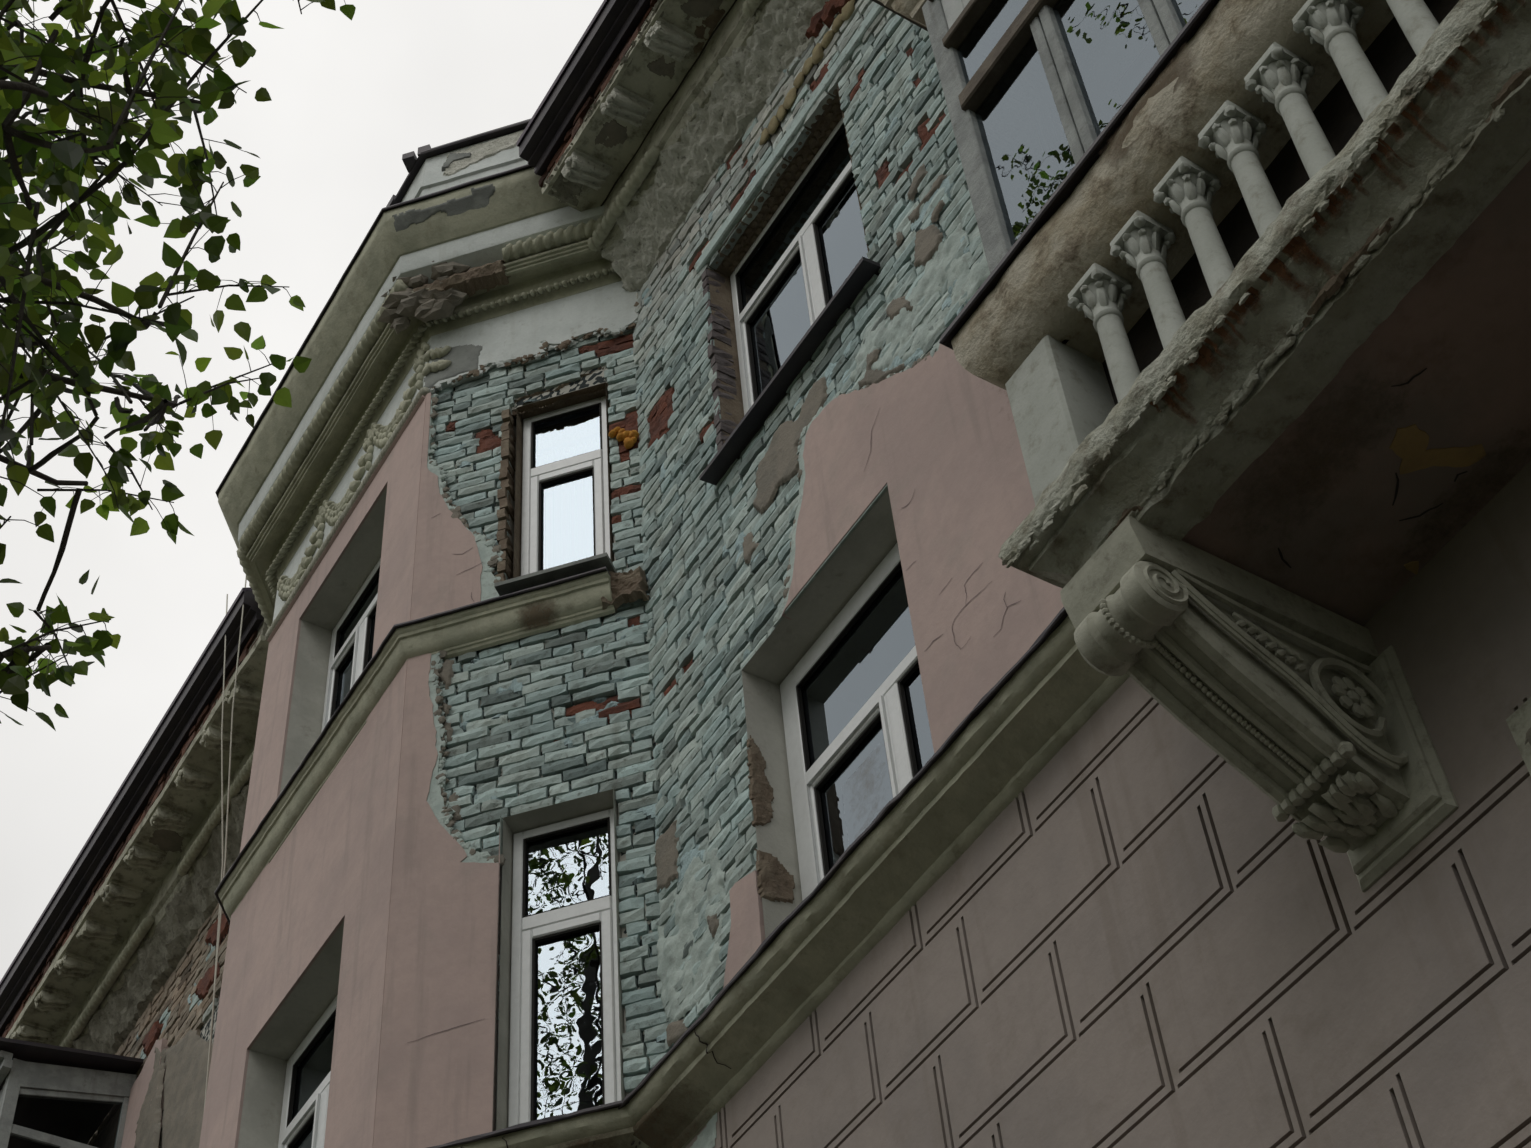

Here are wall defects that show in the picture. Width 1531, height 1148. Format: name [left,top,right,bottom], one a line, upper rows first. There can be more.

corrosion [1369,0,1525,188]
spalling [1479,0,1504,21]
spalling [377,261,471,334]
corrosion [1149,169,1366,423]
spalling [1078,33,1531,570]
spalling [1002,315,1226,568]
spalling [428,0,984,1093]
spalling [115,903,230,1079]
peeling [690,1113,717,1148]